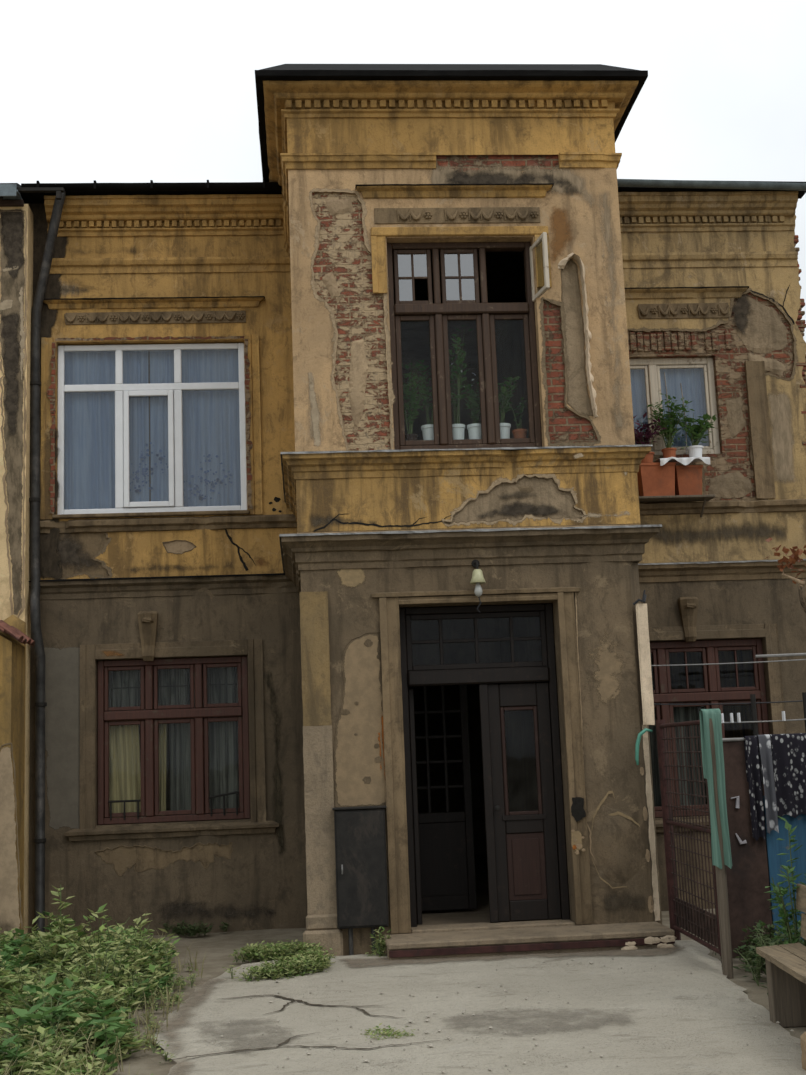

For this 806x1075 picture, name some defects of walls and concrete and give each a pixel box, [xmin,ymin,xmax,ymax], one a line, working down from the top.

damp [28,203,86,450]
spalling [309,188,395,453]
spalling [539,252,601,458]
spalling [627,235,806,501]
damp [40,427,62,579]
crack [225,529,255,571]
crack [314,514,451,532]
spalling [441,474,589,527]
damp [479,492,559,518]